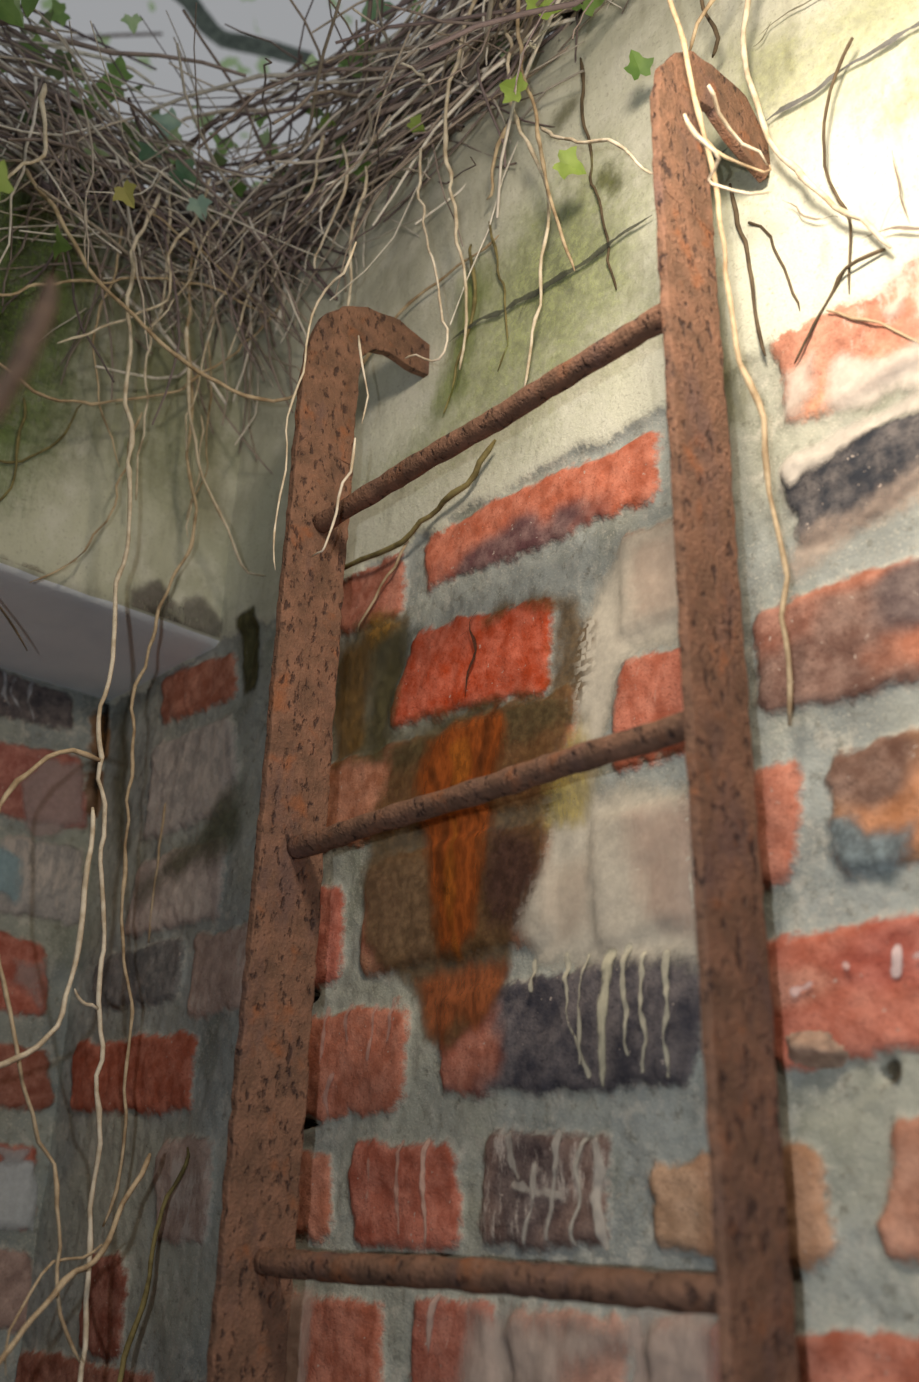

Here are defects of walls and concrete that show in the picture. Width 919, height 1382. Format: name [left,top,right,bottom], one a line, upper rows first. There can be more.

crack [753,0,811,47]
crack [766,21,919,121]
crack [448,215,652,343]
crack [465,612,477,696]
damp [577,520,678,743]
damp [514,770,697,1086]
damp [506,1129,608,1250]